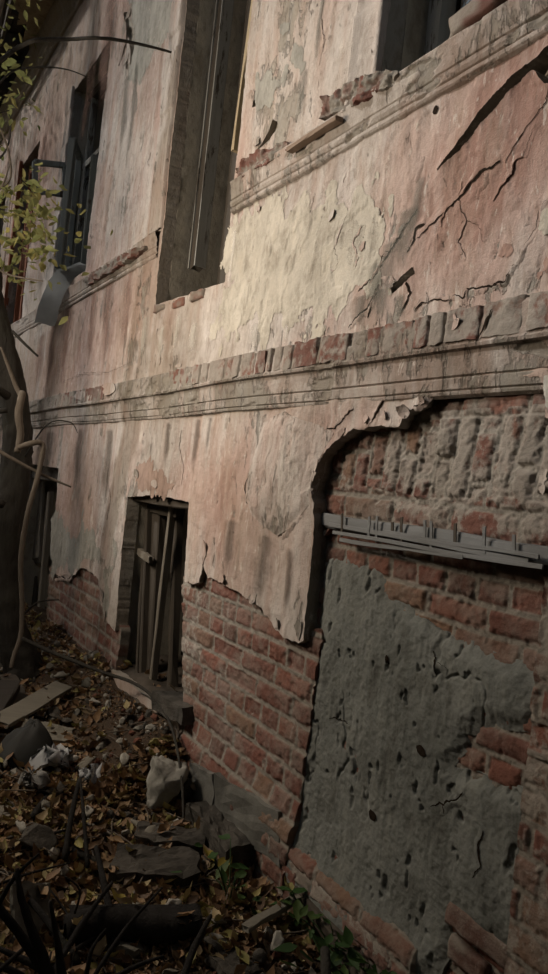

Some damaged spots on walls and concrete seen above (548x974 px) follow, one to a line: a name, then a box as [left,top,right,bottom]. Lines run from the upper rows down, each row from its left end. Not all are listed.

spalling [236,141,290,177]
spalling [318,69,399,121]
peeling [169,172,548,385]
crack [330,71,548,341]
spalling [326,375,548,546]
spalling [46,508,130,670]
spalling [178,540,326,899]
spalling [504,565,548,974]